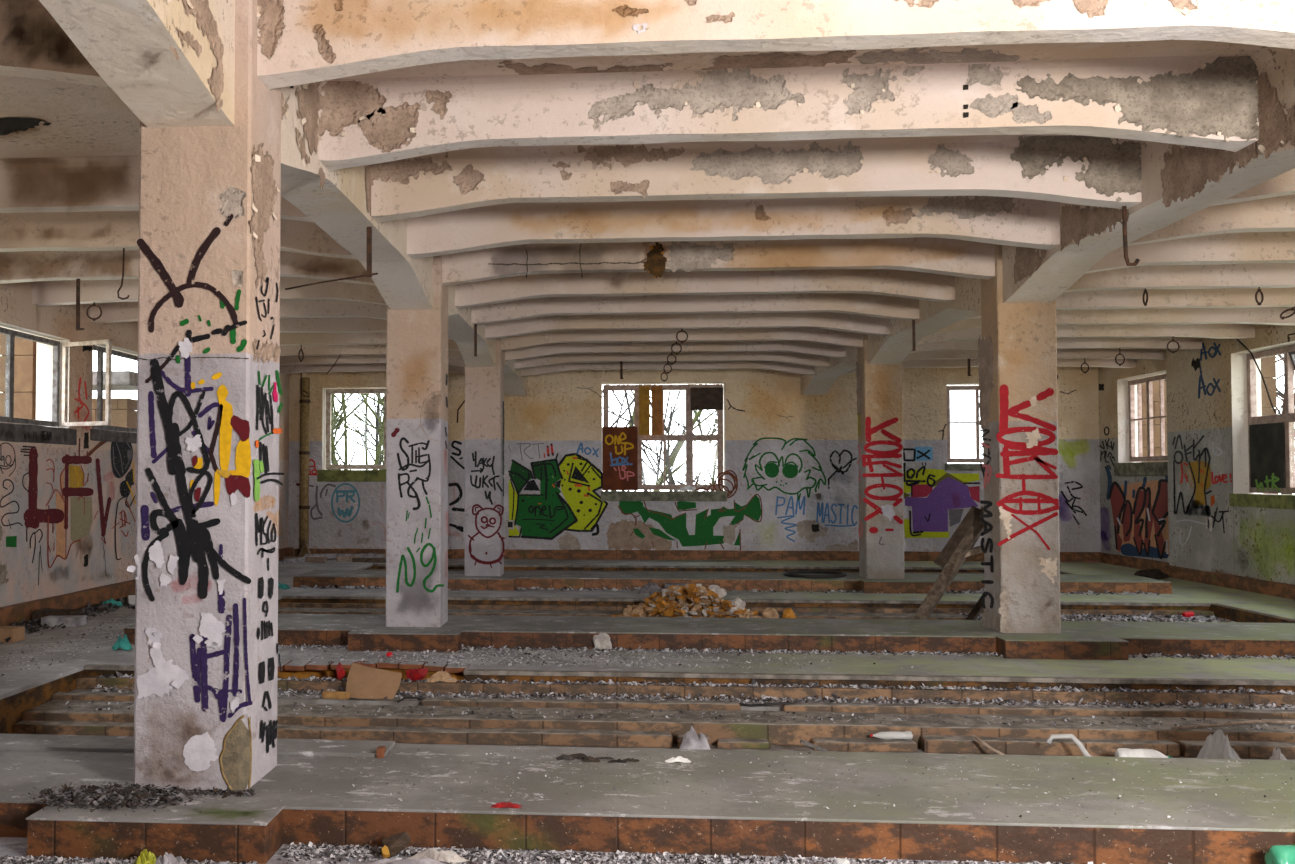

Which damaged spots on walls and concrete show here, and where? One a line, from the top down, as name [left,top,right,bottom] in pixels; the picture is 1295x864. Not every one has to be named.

peeling [167,0,224,113]
peeling [313,24,336,64]
peeling [1013,0,1051,8]
peeling [1074,0,1109,18]
peeling [219,143,280,288]
peeling [281,78,486,216]
peeling [484,47,1295,284]